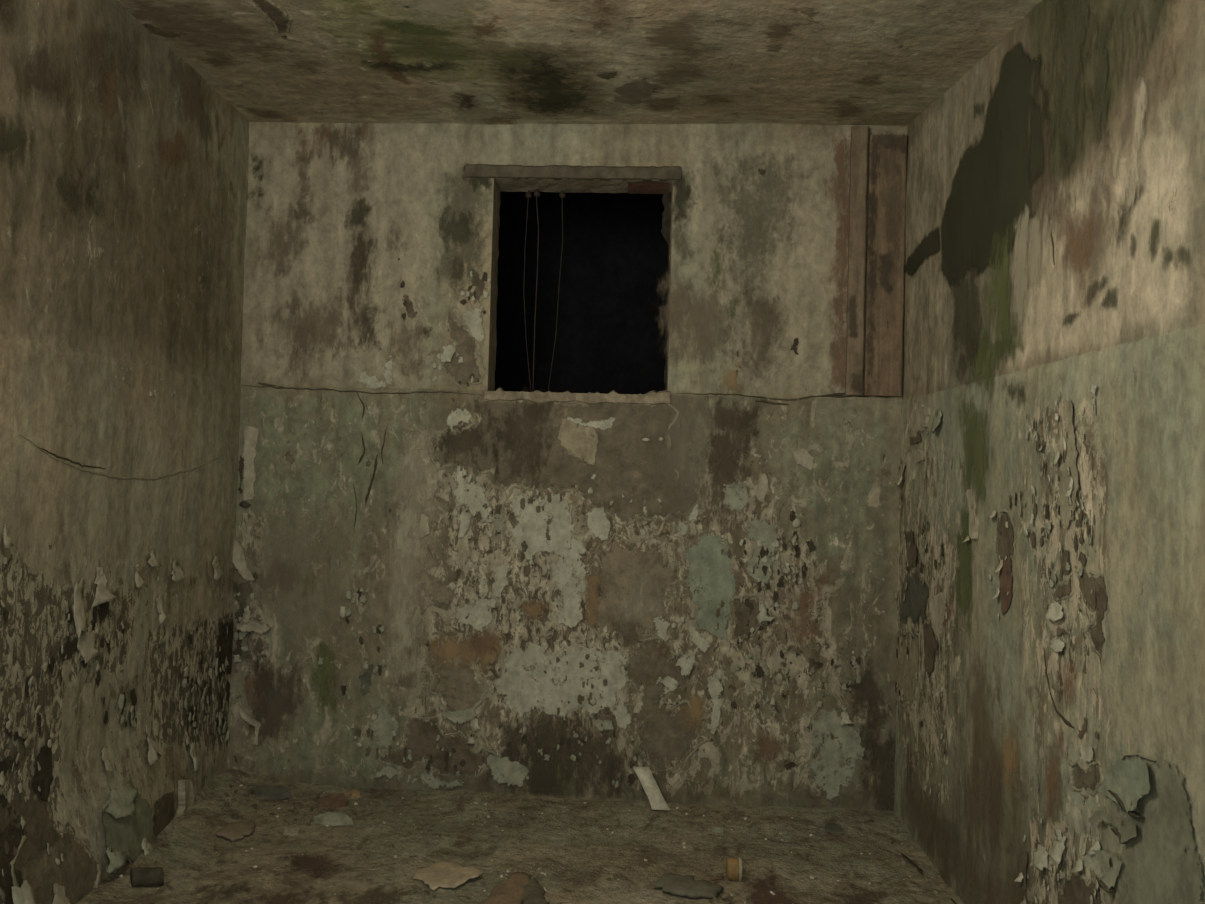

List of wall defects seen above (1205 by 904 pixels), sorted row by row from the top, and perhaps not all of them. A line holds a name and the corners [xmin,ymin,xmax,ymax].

water stain [359,0,485,72]
water stain [494,52,589,116]
water stain [276,150,376,368]
flaking render [432,264,491,389]
water stain [439,165,490,286]
water stain [904,43,1189,390]
flaking render [0,539,272,904]
flaking render [312,587,529,789]
flaking render [428,398,866,803]
water stain [956,402,986,637]
peeling [961,399,1110,799]
flaking render [1014,817,1106,904]